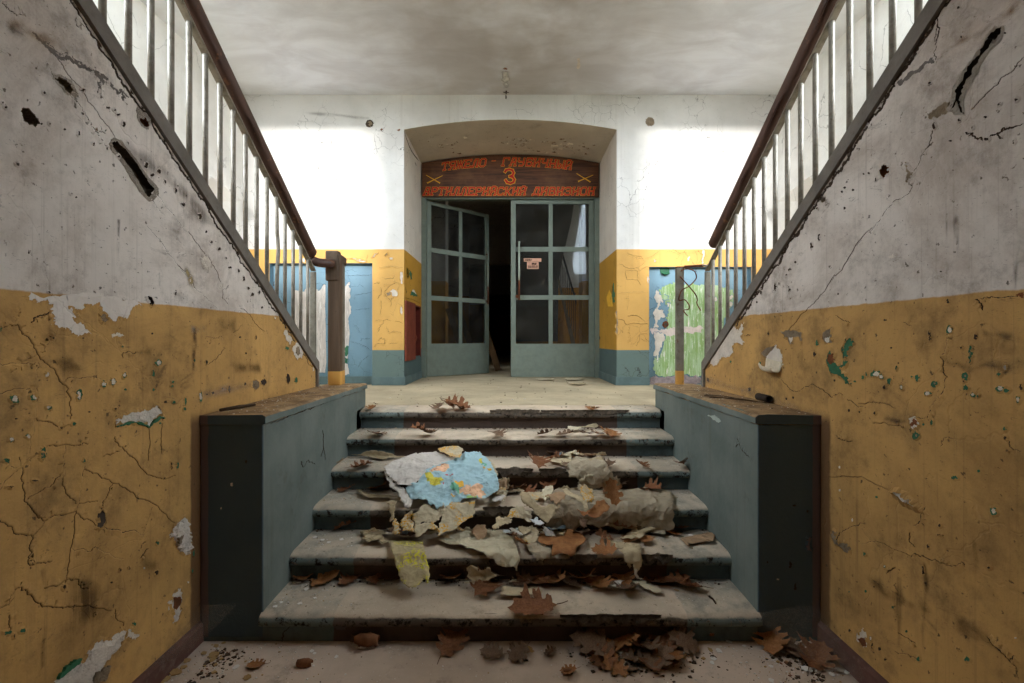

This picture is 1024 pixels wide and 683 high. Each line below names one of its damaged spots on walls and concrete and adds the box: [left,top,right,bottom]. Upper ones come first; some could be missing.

spalling [0,99,52,127]
flaking render [41,65,186,208]
crack [735,1,948,330]
crack [970,52,1024,110]
peeling [24,289,156,341]
peeling [646,268,750,385]
peeling [112,358,231,429]
peeling [758,327,940,397]
peeling [959,332,981,400]
crack [0,305,178,630]
peeling [50,620,142,683]